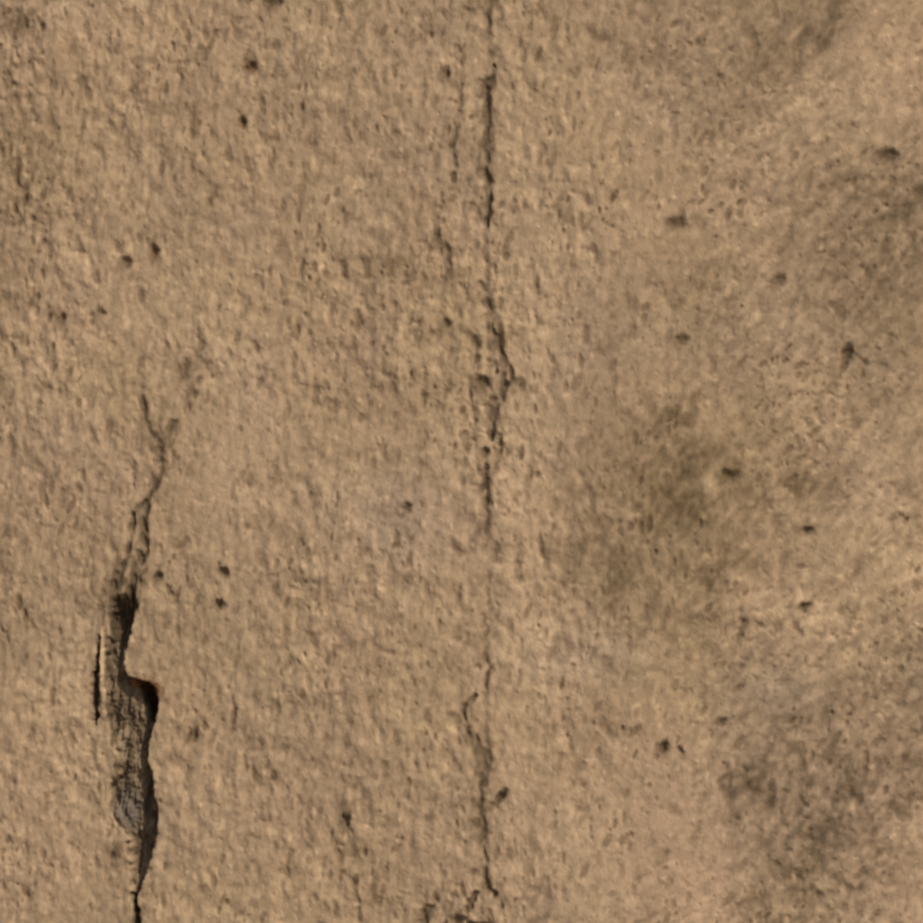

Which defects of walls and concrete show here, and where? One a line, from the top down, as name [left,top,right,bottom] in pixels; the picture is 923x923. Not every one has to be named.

crack [481,64,496,228]
crack [489,329,513,440]
crack [109,456,164,610]
crack [480,464,489,533]
crack [92,657,100,724]
crack [461,694,503,908]
crack [132,892,141,923]